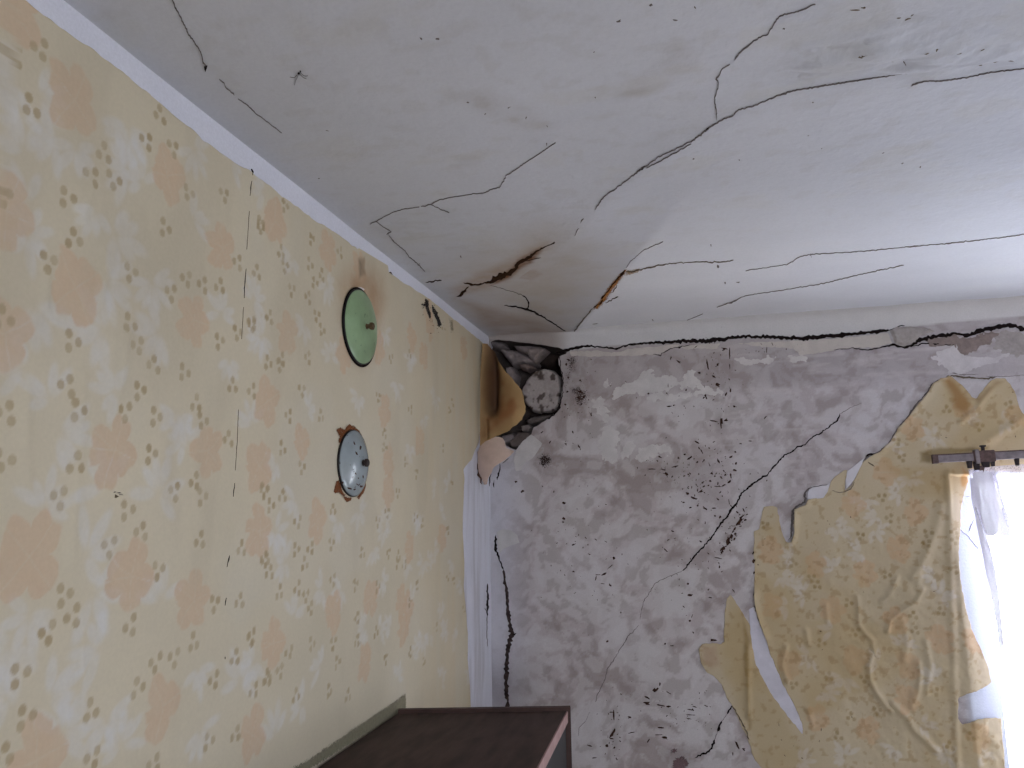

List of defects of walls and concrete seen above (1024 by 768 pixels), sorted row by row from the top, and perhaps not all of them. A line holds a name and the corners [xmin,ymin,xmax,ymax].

crack [172,0,282,133]
crack [371,4,1024,356]
damp [410,199,653,336]
spalling [491,340,724,471]
crack [485,536,516,707]
crack [578,403,861,736]